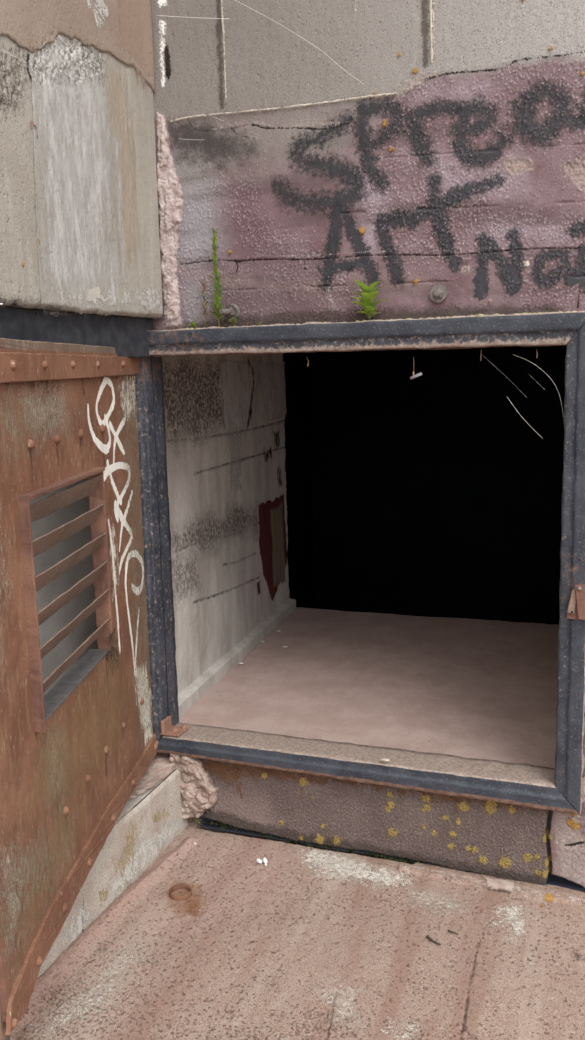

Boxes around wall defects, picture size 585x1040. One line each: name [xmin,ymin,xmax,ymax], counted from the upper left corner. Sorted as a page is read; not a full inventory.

peeling [0,0,171,122]
water stain [31,37,125,306]
crack [181,247,578,273]
peeling [257,432,287,601]
crack [461,951,478,1040]